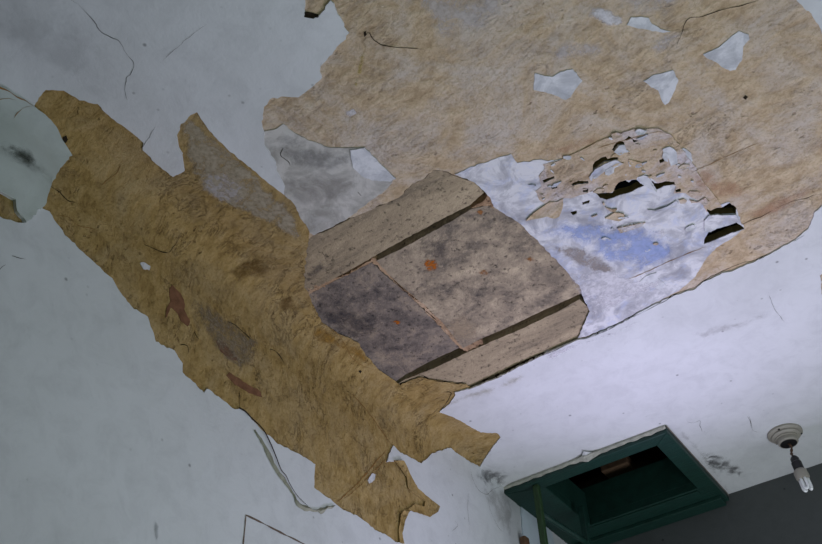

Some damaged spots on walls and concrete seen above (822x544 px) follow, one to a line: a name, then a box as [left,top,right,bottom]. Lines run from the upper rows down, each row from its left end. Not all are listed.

crack [79,5,134,98]
flaking render [262,0,822,305]
flaking render [0,86,500,542]